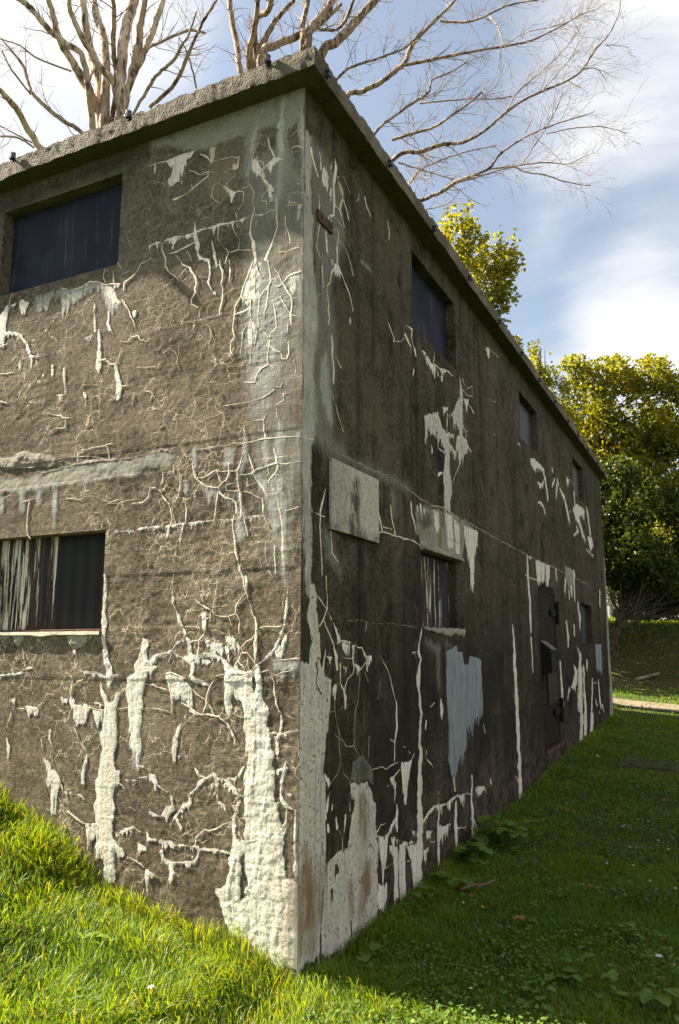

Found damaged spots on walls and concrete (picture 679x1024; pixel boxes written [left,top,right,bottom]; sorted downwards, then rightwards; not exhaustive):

damp [0,305,9,348]
crack [0,331,35,374]
damp [35,147,275,401]
crack [150,516,295,686]
crack [316,489,443,796]
spalling [425,627,466,637]
damp [74,728,88,785]
damp [172,724,182,763]
crack [119,766,244,885]
damp [216,664,270,924]
crack [269,715,298,835]
spalling [350,755,373,785]